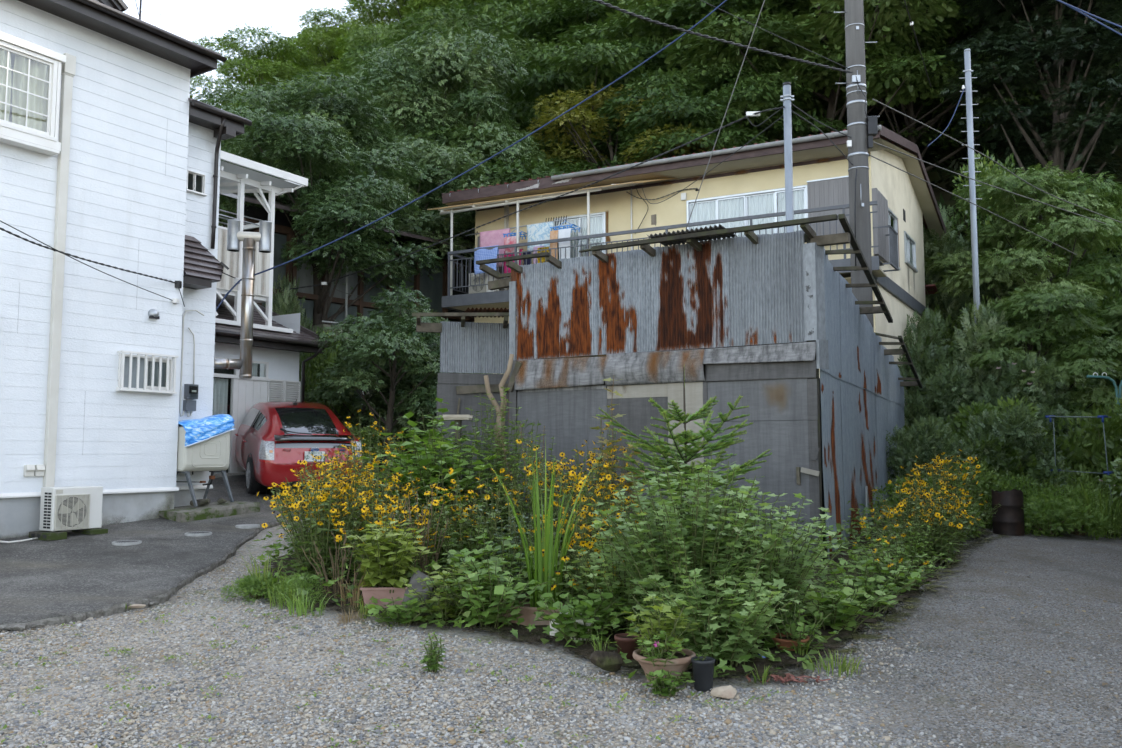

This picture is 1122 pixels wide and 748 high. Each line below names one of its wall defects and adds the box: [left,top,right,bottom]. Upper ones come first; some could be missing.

corrosion [512,211,637,388]
corrosion [650,241,758,375]
corrosion [821,346,881,560]